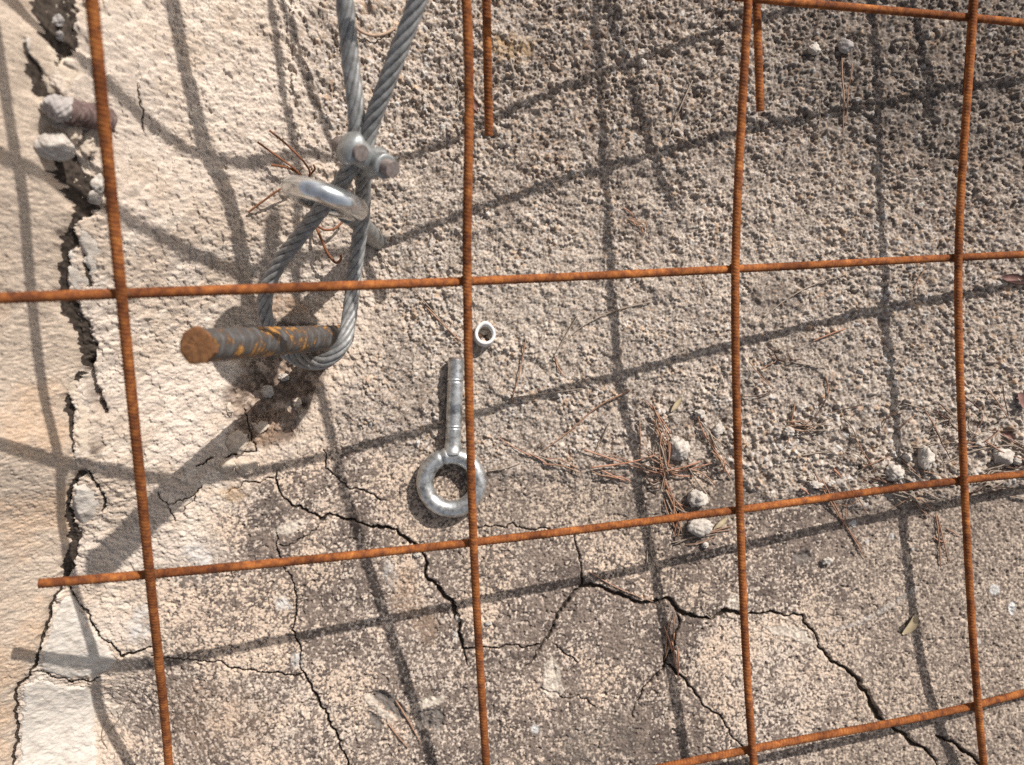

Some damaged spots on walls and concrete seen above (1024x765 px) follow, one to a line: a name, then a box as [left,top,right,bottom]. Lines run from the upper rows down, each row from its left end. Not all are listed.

spalling [33,132,76,162]
peeling [67,229,101,290]
peeling [72,483,104,524]
rust [0,0,730,765]
crack [11,155,979,765]
rust [478,0,1024,765]
peeling [18,592,117,765]